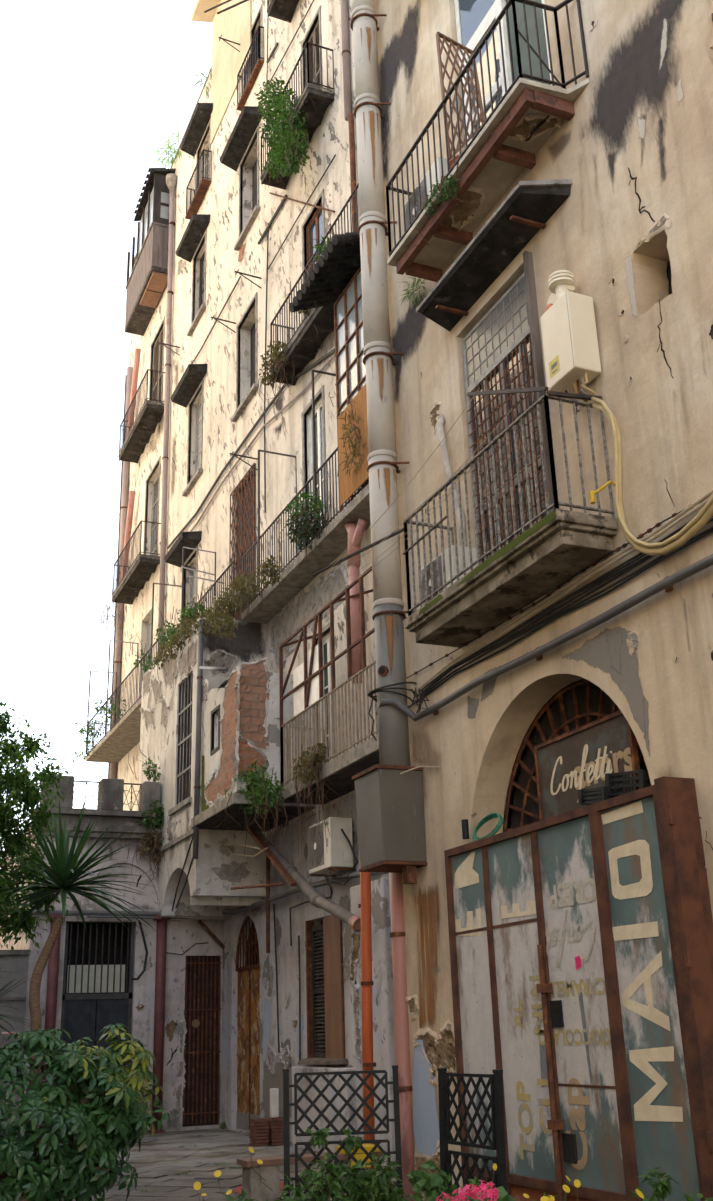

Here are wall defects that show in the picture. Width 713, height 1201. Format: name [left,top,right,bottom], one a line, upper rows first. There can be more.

rust [363,111,378,180]
spalling [508,114,562,142]
crack [628,167,655,223]
rust [362,228,377,271]
spalling [608,213,671,317]
rust [371,358,388,400]
rust [377,468,394,506]
peeling [139,563,348,806]
rust [415,886,440,1028]
spalling [406,994,457,1090]